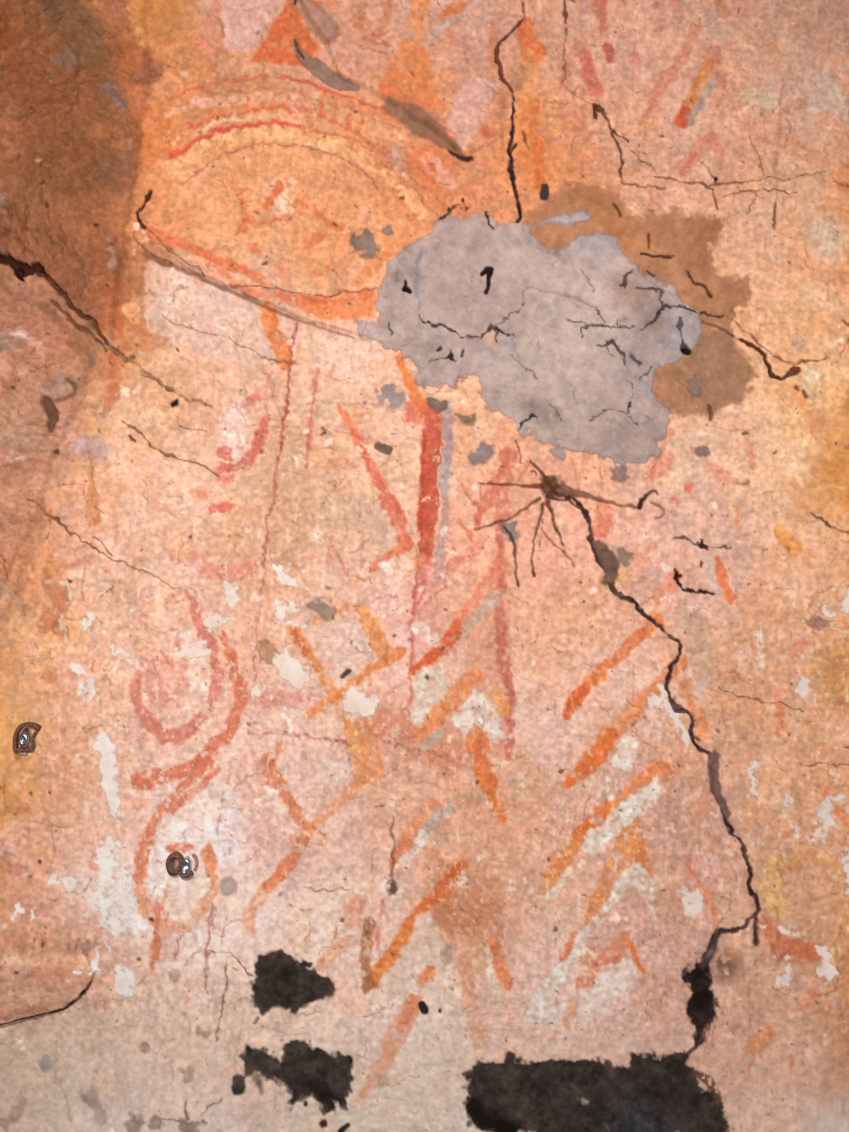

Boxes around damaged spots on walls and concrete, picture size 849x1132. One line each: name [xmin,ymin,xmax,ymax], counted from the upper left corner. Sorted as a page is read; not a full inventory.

crack [563,0,803,227]
crack [0,255,211,432]
crack [213,334,297,364]
peeling [541,209,590,225]
leakage [526,184,754,421]
crack [567,253,849,425]
crack [128,425,219,477]
crack [475,412,761,935]
leakage [232,1040,353,1132]
leakage [252,950,335,1024]
leakage [463,928,734,1132]